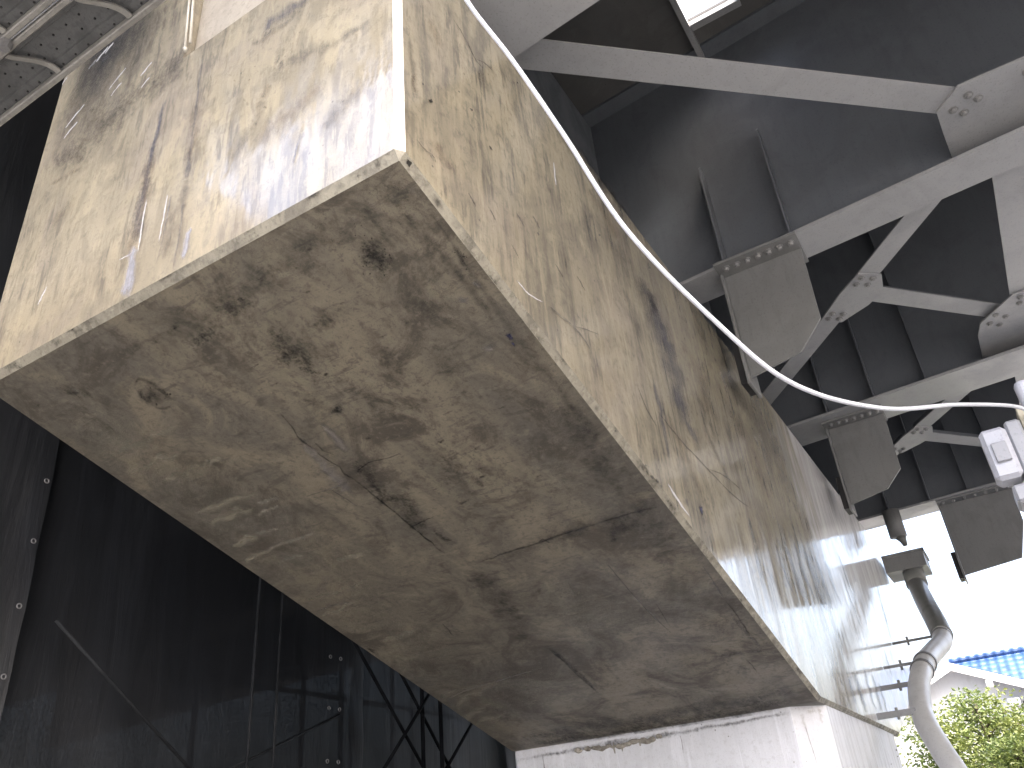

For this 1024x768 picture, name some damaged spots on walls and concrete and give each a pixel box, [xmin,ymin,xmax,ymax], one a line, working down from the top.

crack [292,427,447,541]